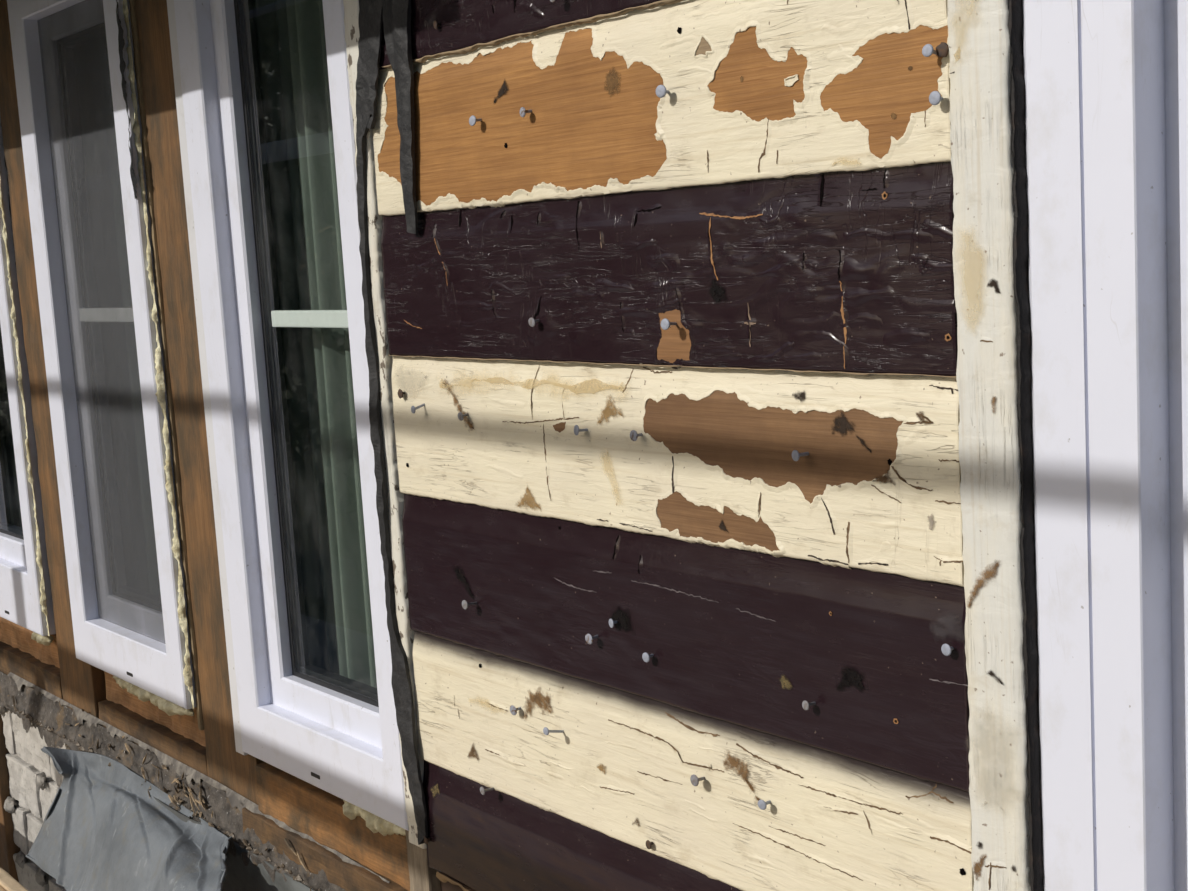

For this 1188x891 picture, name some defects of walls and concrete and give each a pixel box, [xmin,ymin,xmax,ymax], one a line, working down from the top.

peeling [376,23,670,212]
peeling [693,19,950,167]
crack [502,364,580,501]
peeling [654,306,695,369]
peeling [640,384,907,509]
crack [929,381,958,395]
crack [555,519,774,621]
peeling [654,487,786,557]
crack [808,498,889,569]
crack [600,709,954,833]
crack [733,821,864,881]
crack [930,833,1007,890]